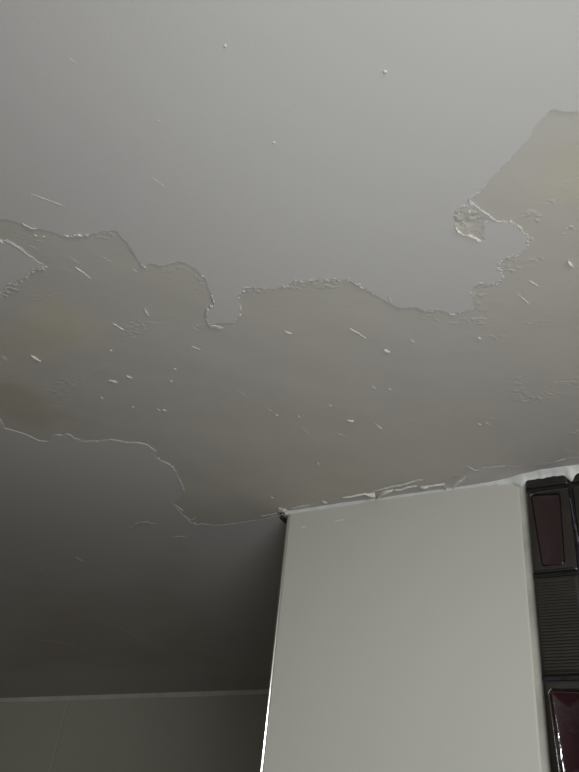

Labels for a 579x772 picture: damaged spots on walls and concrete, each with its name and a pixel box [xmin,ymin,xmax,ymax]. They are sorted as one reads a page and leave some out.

peeling [0,140,579,526]